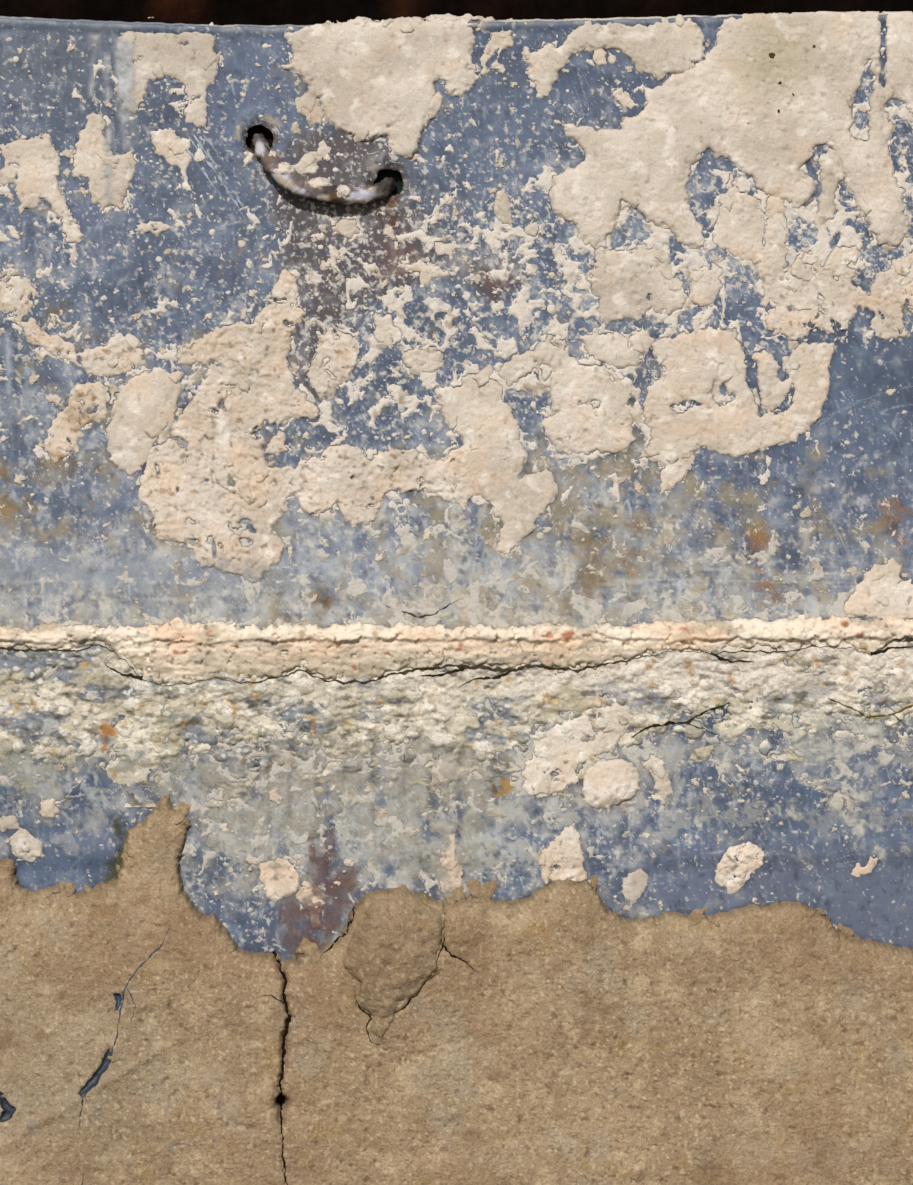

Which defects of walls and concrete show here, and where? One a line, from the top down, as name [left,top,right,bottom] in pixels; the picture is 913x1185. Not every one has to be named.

peeling [0,11,913,583]
peeling [844,558,913,621]
crack [0,638,913,687]
crack [631,702,729,738]
crack [828,698,913,728]
peeling [0,815,45,862]
peeling [258,856,330,929]
corrosion [280,830,358,950]
peeling [538,822,587,885]
peeling [715,841,764,894]
crack [79,927,170,1126]
crack [261,951,292,1185]